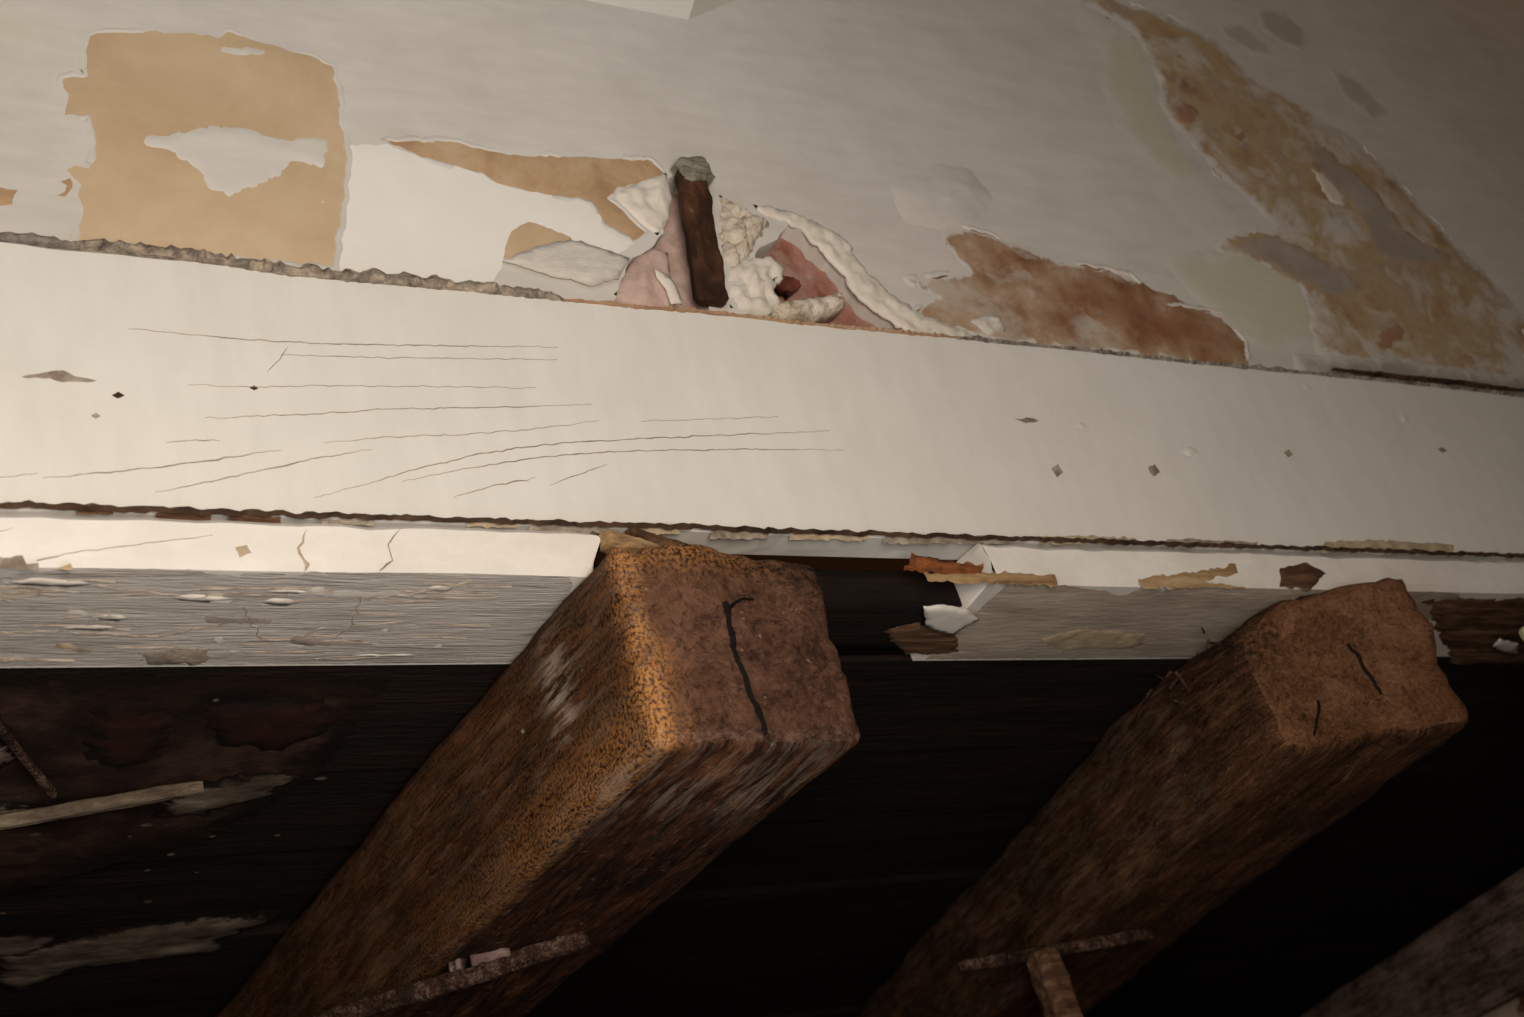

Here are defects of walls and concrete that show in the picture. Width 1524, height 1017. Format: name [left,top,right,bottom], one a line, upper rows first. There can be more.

water stain [1217,7,1311,60]
peeling [56,27,699,310]
peeling [1060,0,1524,376]
peeling [718,197,1252,366]
water stain [1159,249,1524,394]
peeling [0,555,92,587]
spalling [156,512,211,521]
spalling [229,514,281,523]
spalling [321,518,375,526]
spalling [789,534,1015,545]
peeling [1138,563,1246,590]
spalling [1279,539,1454,591]